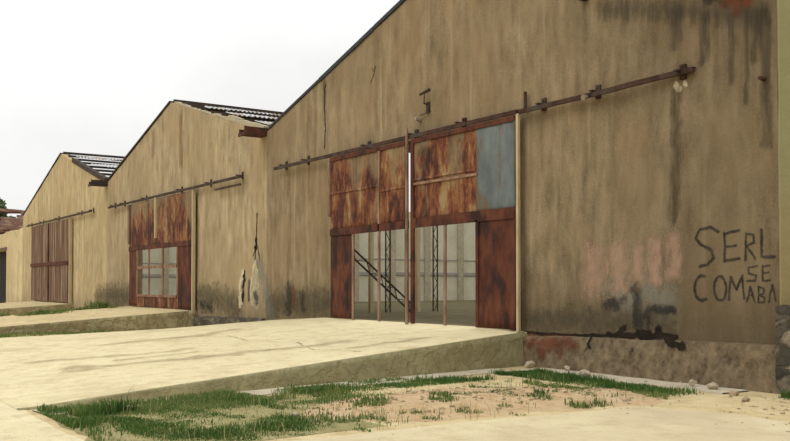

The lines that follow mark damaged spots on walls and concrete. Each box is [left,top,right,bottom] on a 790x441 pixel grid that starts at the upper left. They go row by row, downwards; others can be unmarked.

crack [252,213,260,261]
peeling [238,260,273,312]